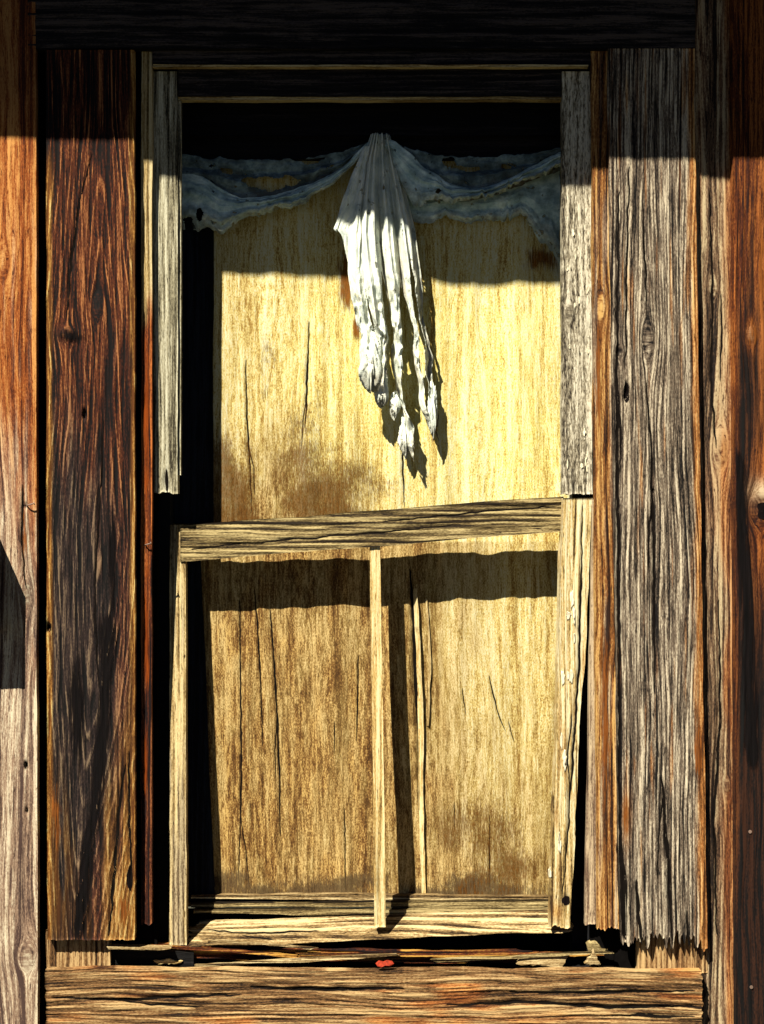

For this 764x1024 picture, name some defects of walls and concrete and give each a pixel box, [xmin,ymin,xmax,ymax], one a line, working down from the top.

crack [245,364,255,511]
crack [301,323,310,445]
water stain [270,417,379,517]
crack [238,590,281,878]
crack [489,676,514,741]